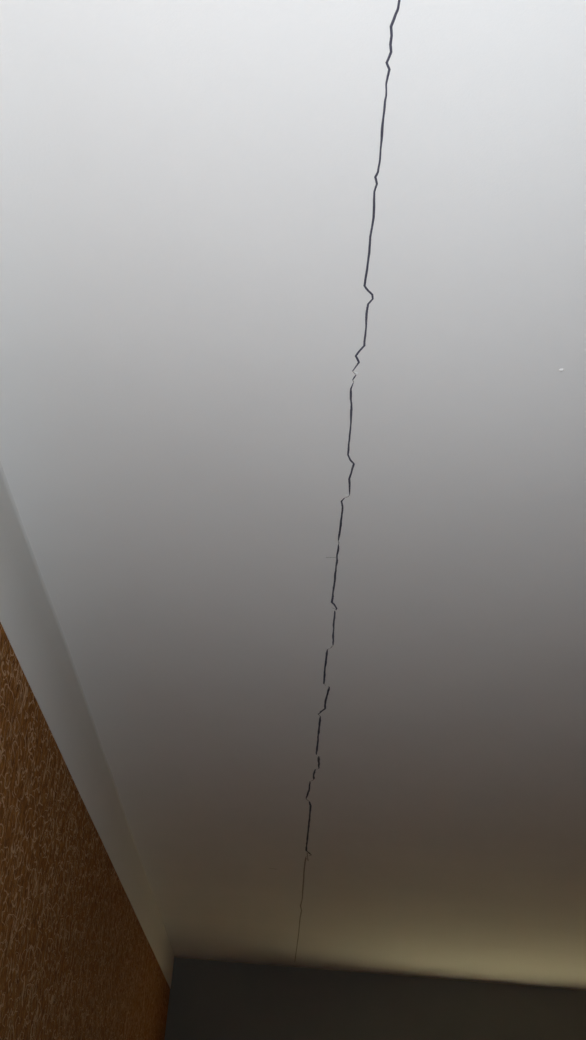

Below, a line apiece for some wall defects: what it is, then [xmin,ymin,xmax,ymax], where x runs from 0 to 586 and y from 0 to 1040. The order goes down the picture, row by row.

crack [295,0,401,959]